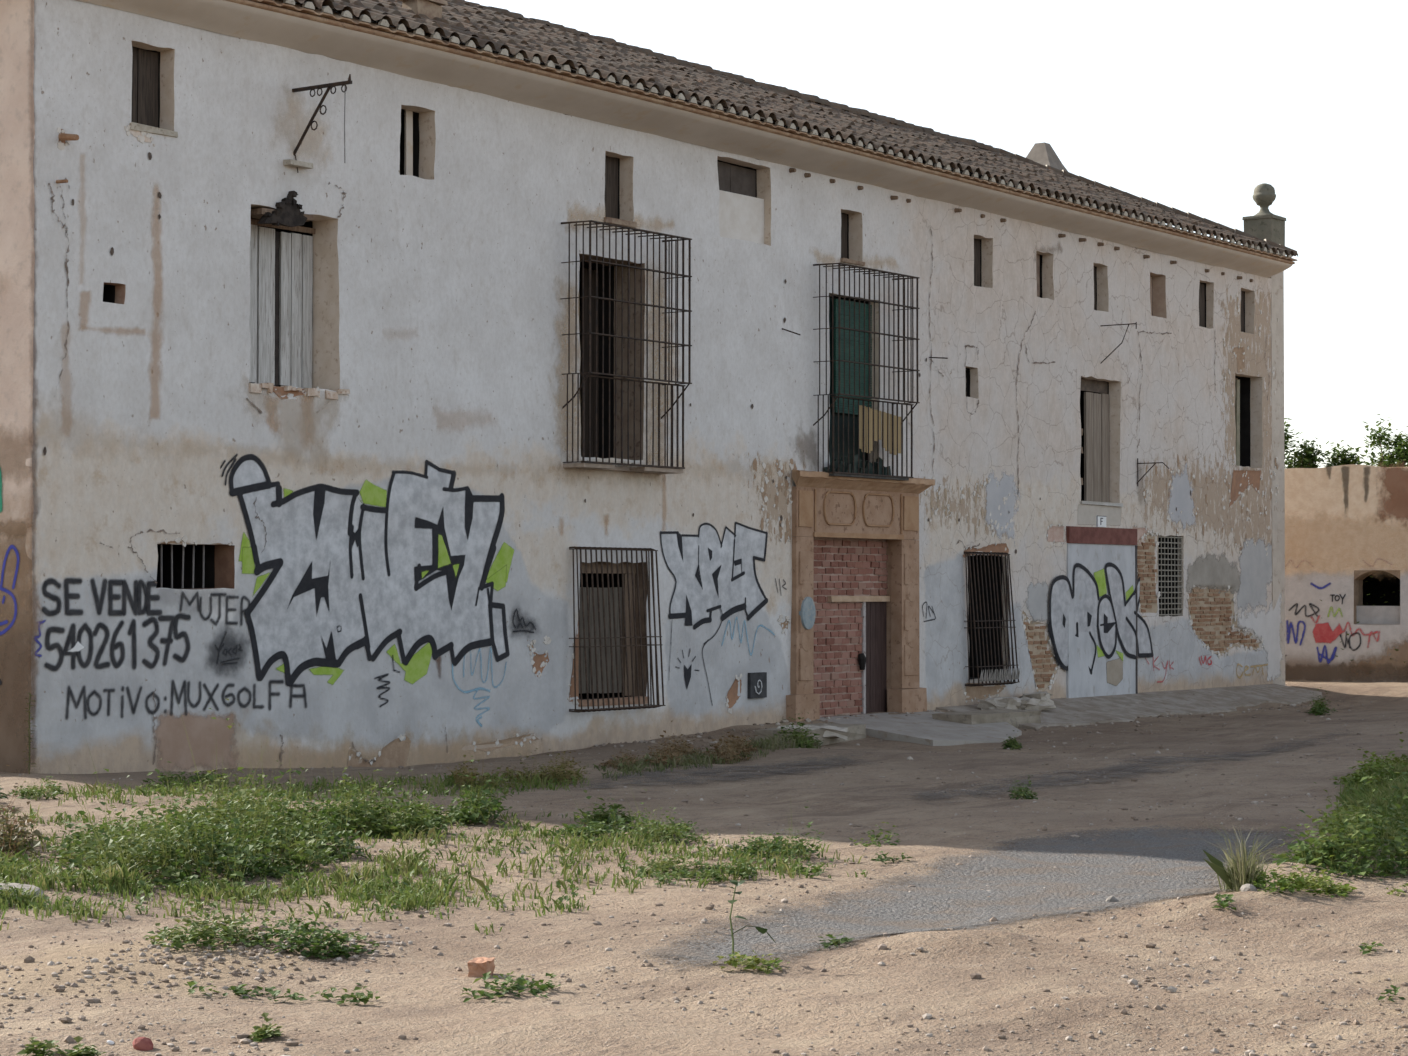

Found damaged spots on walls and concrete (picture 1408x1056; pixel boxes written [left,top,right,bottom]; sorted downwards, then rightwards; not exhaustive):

crack [929,229,979,474]
crack [1016,311,1055,494]
crack [1128,331,1172,452]
flaking render [1132,292,1279,617]
water stain [1327,466,1369,507]
flaking render [1022,611,1061,692]
flaking render [1187,585,1265,659]